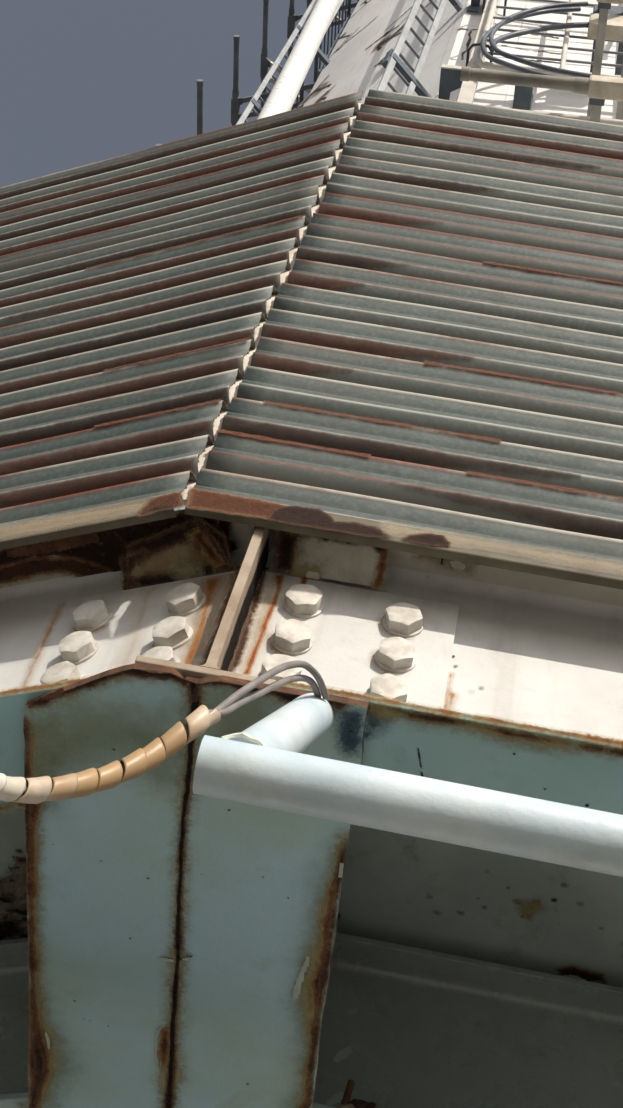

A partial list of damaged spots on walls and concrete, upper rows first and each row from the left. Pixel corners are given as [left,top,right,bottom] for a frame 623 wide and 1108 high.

rust [0,98,623,256]
rust [0,203,623,420]
rust [0,386,623,499]
rust [0,486,623,779]
rust [0,802,58,1108]
rust [293,836,347,1108]